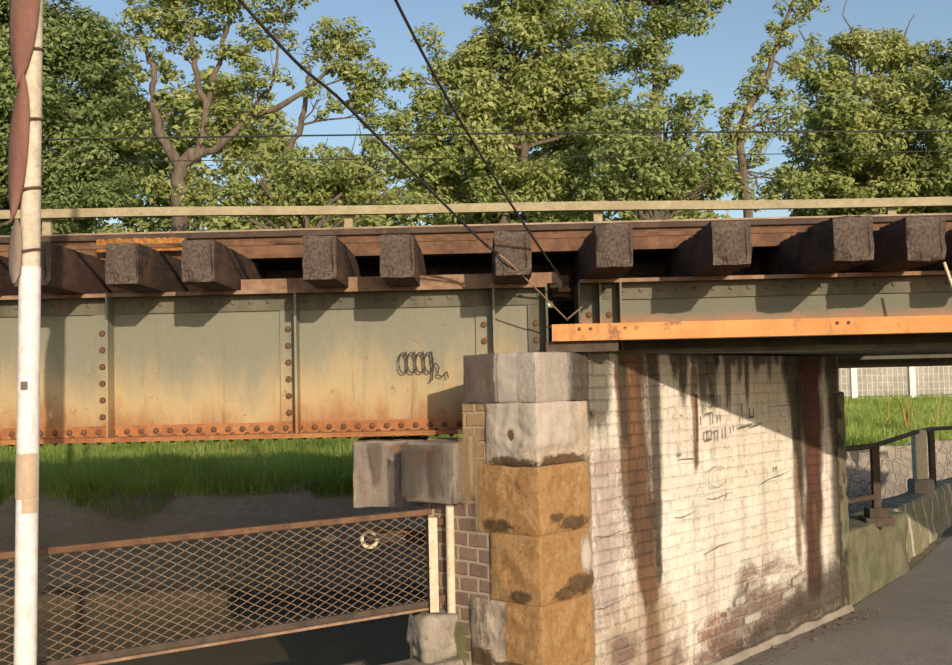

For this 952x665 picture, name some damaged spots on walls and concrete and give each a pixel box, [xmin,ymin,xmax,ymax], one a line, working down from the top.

damp [369,443,383,485]
damp [617,363,627,445]
damp [647,354,805,582]
peeling [698,553,807,665]
damp [725,356,850,659]
corrosion [795,356,824,590]